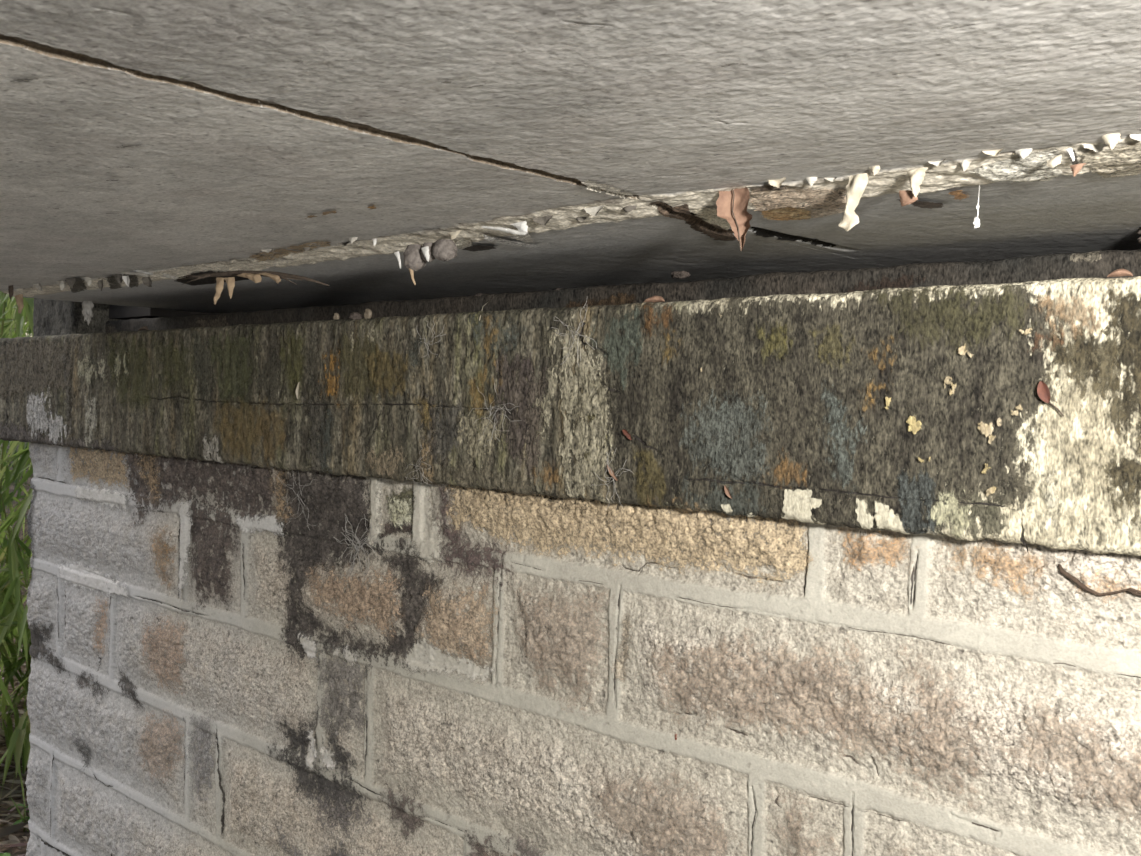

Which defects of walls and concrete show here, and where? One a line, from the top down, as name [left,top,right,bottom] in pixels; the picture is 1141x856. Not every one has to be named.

crack [0,34,215,90]
crack [325,116,473,156]
peeling [959,133,1141,182]
peeling [481,215,553,248]
spalling [576,180,737,241]
peeling [749,177,846,220]
peeling [56,270,178,291]
leakage [26,387,67,445]
leakage [77,355,129,449]
leakage [122,314,669,674]
leakage [924,490,971,540]
leakage [267,715,425,856]